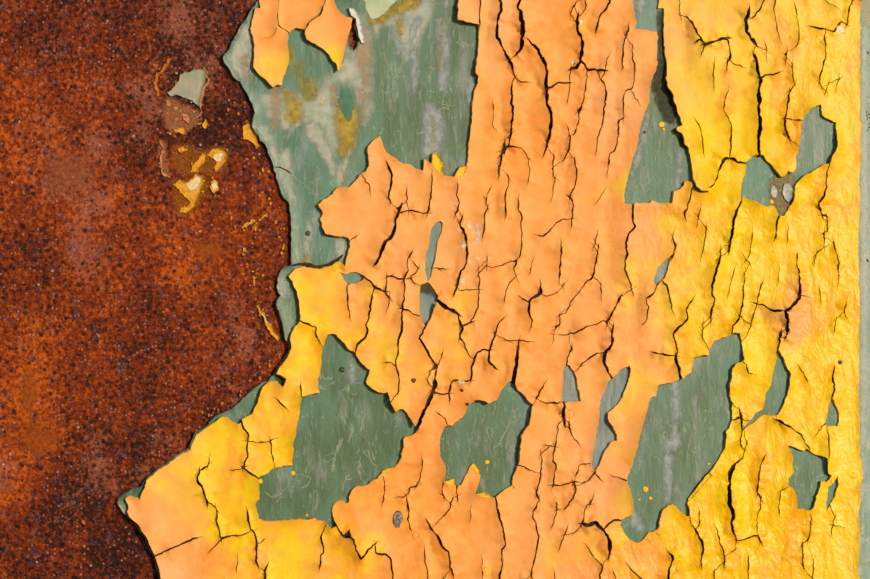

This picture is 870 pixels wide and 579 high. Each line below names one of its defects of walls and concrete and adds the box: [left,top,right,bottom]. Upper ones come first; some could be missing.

corrosion [0,0,291,579]
corrosion [271,64,316,126]
peeling [225,0,480,342]
crack [346,0,853,428]
crack [154,459,267,579]
peeling [255,334,419,529]
crack [382,460,471,579]
peeling [440,381,533,498]
crack [517,384,642,579]
peeling [621,332,745,543]
crack [690,403,786,579]
peeling [788,446,839,511]